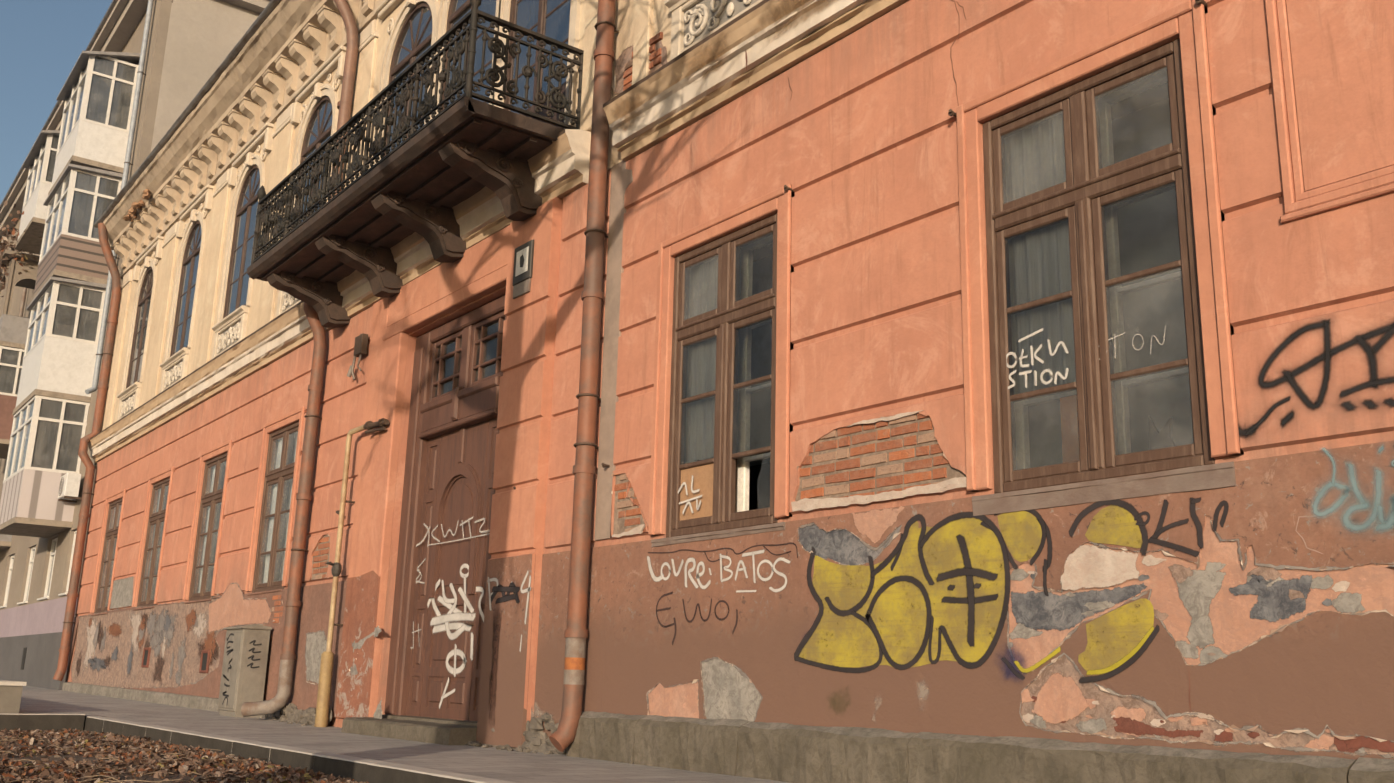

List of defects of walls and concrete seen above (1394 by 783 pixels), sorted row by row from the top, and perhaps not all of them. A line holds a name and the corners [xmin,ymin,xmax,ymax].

spalling [611,473,649,538]
spalling [791,410,967,565]
peeling [71,577,283,688]
flaking render [646,657,763,722]
peeling [1007,514,1394,758]